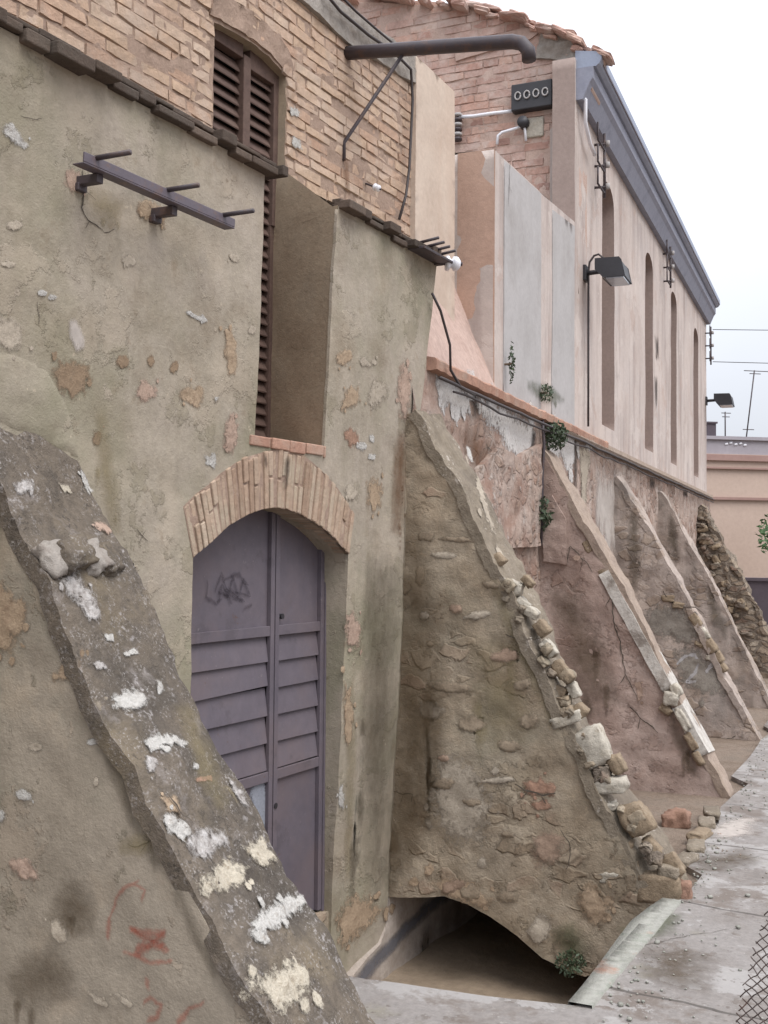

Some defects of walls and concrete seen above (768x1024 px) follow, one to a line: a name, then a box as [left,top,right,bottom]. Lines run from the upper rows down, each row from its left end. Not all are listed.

flaking render [137,200,165,230]
spalling [52,351,92,399]
spalling [341,358,412,419]
crack [605,597,658,733]
flaking render [335,891,396,950]